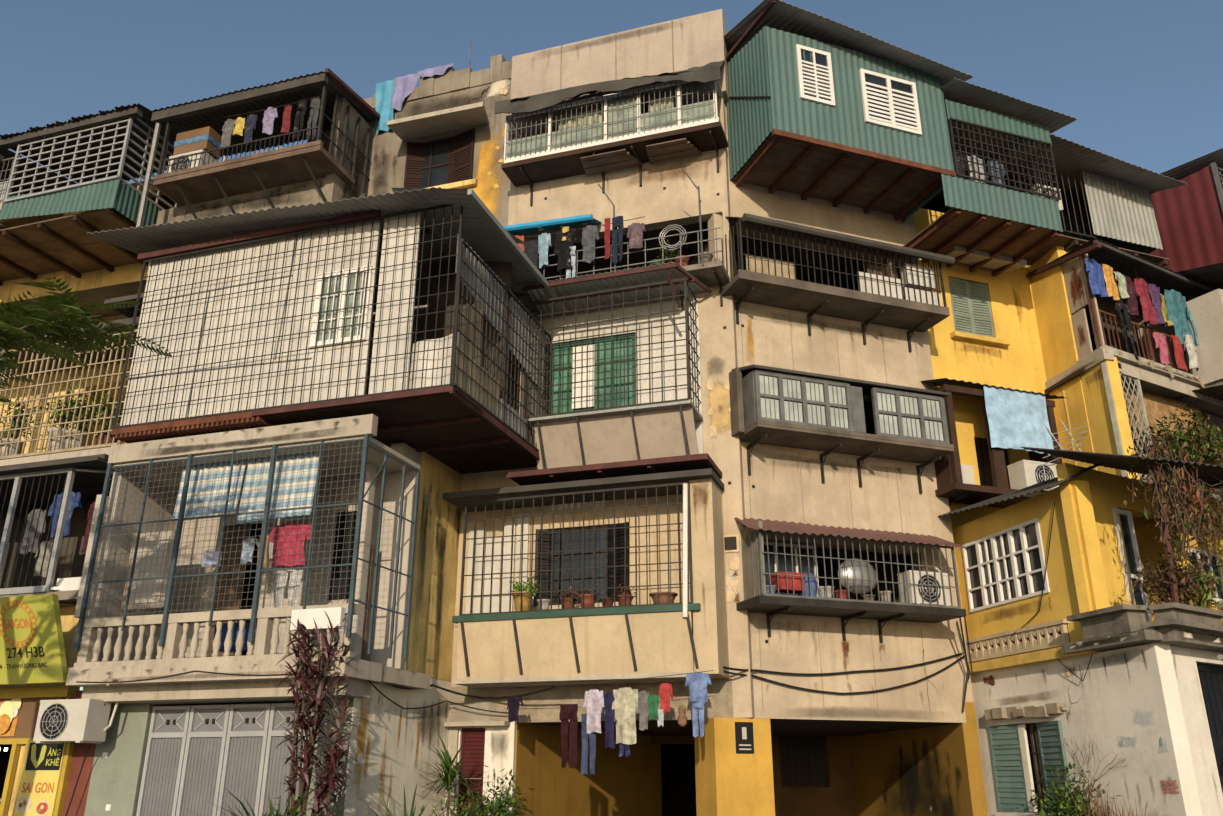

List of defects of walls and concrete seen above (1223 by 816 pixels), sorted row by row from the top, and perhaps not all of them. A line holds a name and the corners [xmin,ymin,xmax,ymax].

peeling [470,128,505,214]
peeling [707,360,731,438]
water stain [421,502,461,596]
water stain [893,743,960,816]